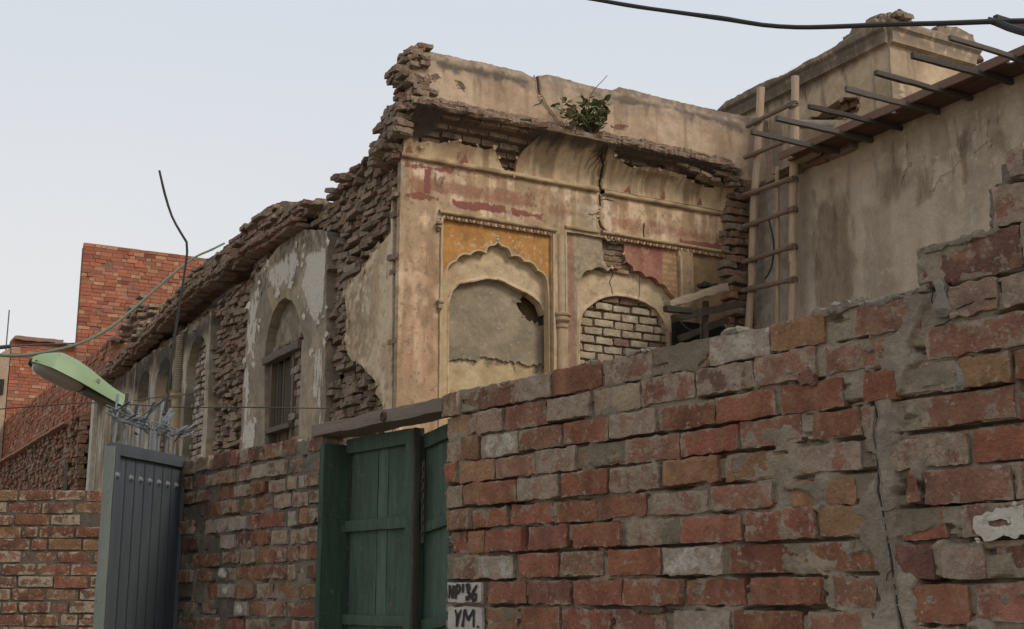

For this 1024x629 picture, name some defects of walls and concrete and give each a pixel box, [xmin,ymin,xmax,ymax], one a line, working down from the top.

crack [533,75,559,122]
spalling [417,113,535,178]
spalling [613,151,743,189]
spalling [112,166,400,455]
crack [863,399,906,629]
peeling [973,501,1024,543]